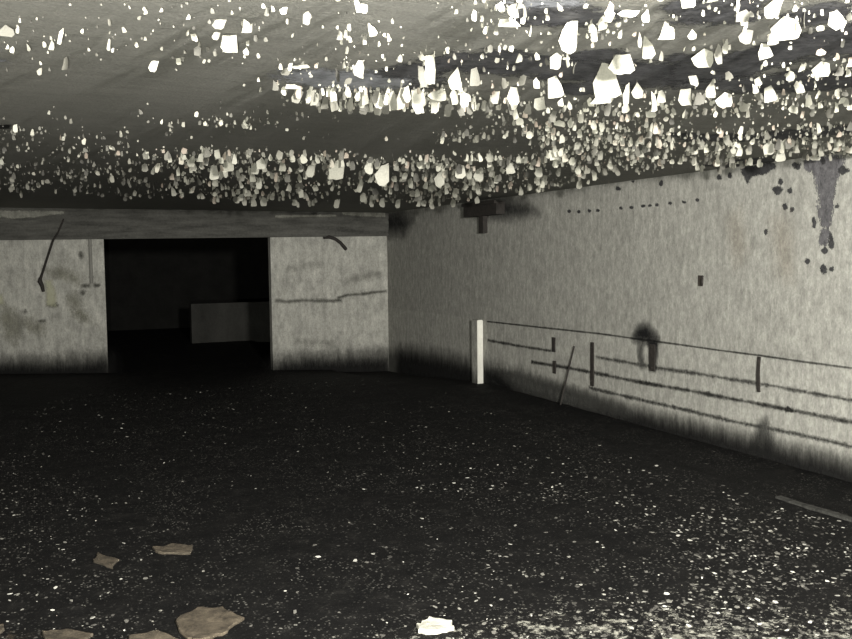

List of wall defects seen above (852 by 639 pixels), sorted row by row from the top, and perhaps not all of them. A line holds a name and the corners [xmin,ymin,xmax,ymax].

peeling [0,0,852,254]
crack [281,291,383,302]